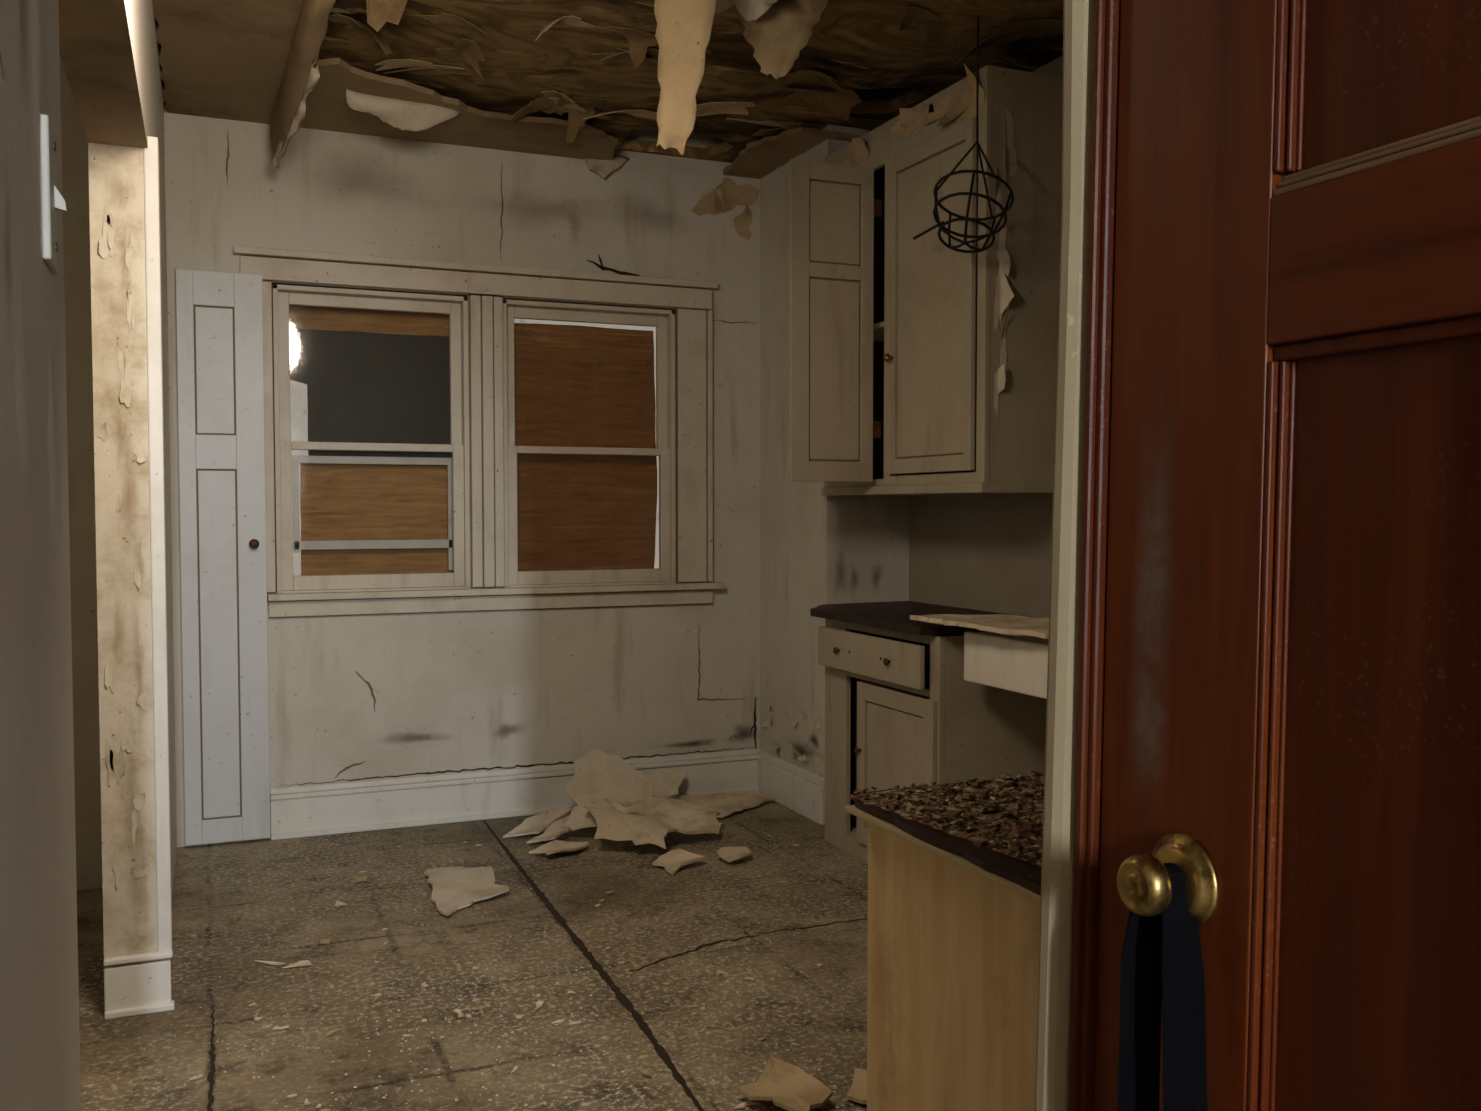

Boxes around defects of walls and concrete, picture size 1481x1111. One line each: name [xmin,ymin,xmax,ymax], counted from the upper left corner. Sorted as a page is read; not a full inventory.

peeling [270,0,484,168]
peeling [511,0,1063,167]
peeling [992,107,1017,414]
crack [483,820,868,1111]